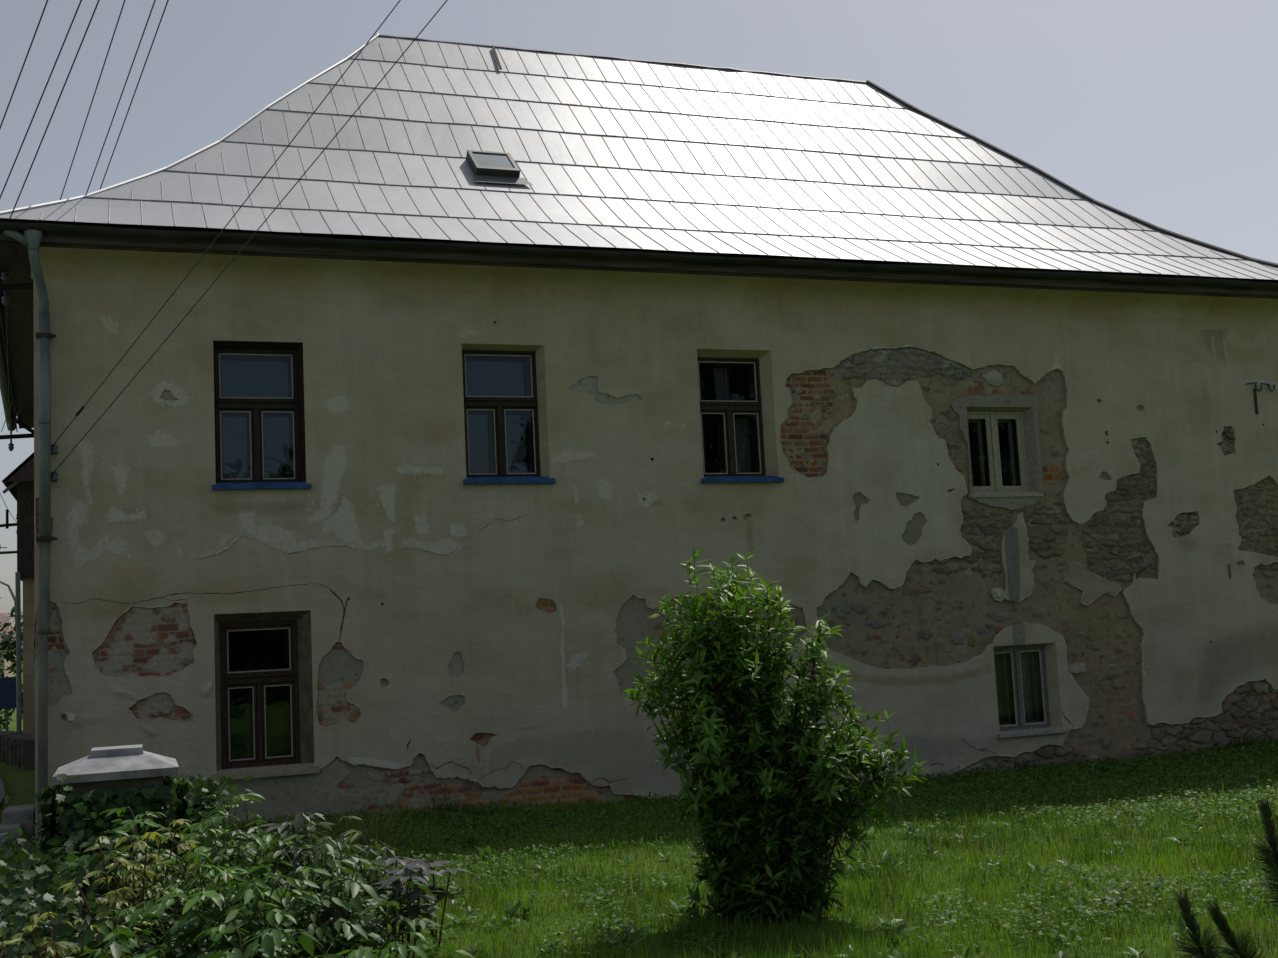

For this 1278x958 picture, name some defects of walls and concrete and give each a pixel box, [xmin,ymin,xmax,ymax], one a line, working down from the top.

flaking render [614,344,1278,776]
flaking render [92,601,198,677]
crack [34,583,348,662]
flaking render [535,597,557,614]
flaking render [128,692,194,723]
flaking render [316,642,365,729]
flaking render [215,753,683,825]